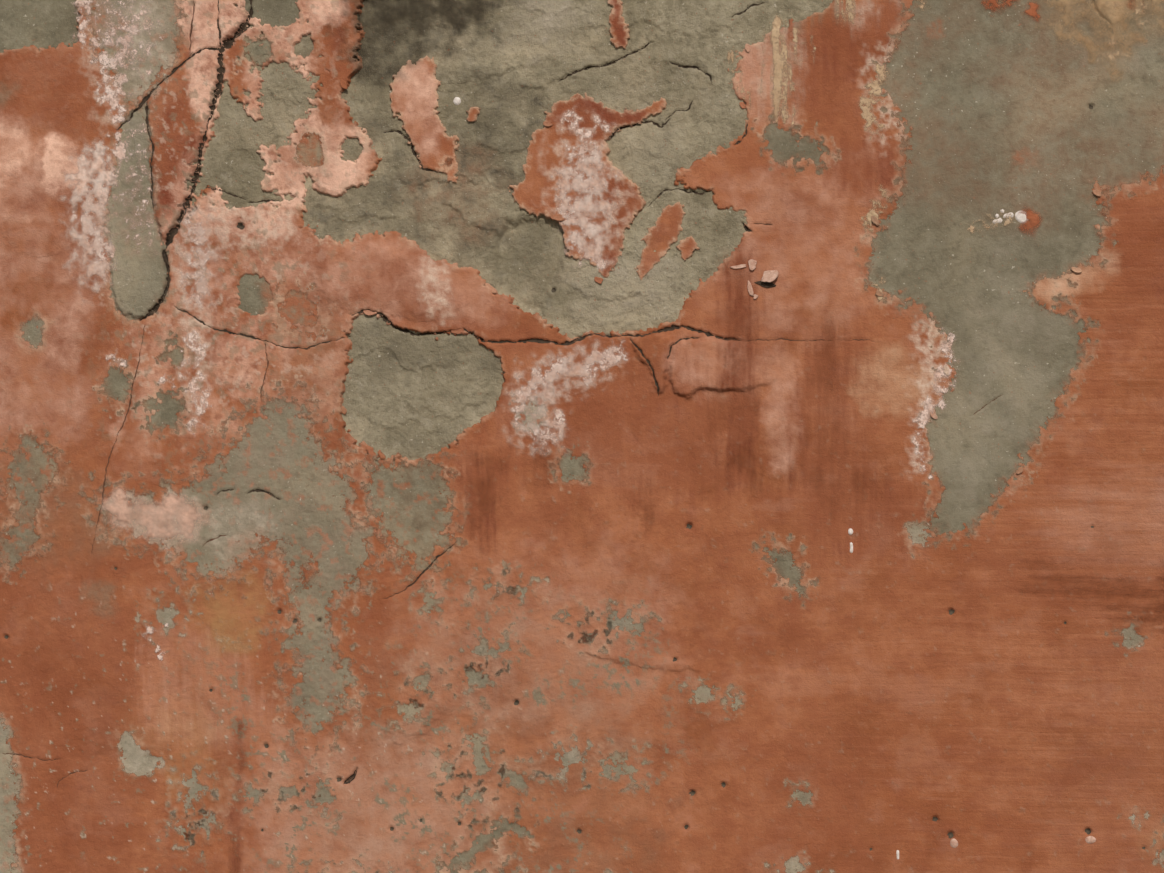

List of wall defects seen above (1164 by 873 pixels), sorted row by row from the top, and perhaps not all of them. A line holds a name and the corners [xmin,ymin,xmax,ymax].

spalling [0,310,662,873]
crack [92,0,869,550]
spalling [179,0,840,343]
efflorescence [511,340,627,455]
peeling [679,678,746,713]
spalling [752,533,819,607]
efflorescence [912,332,956,479]
spalling [855,0,1164,557]